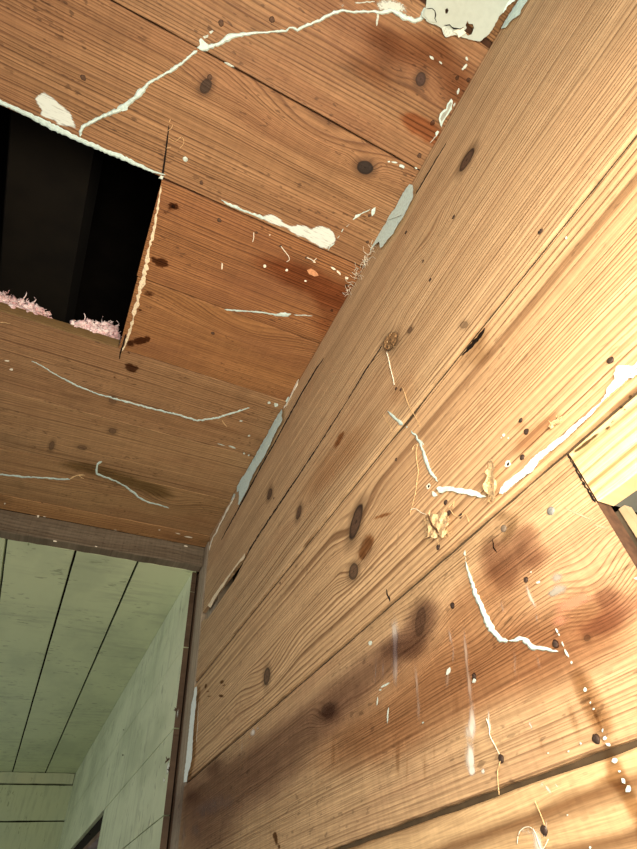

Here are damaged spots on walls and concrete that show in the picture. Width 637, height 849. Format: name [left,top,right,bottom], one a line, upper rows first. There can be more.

peeling [501,0,527,29]
peeling [370,184,413,251]
crack [32,361,248,427]
crack [0,461,168,508]
peeling [231,410,282,505]
damp [466,708,485,775]